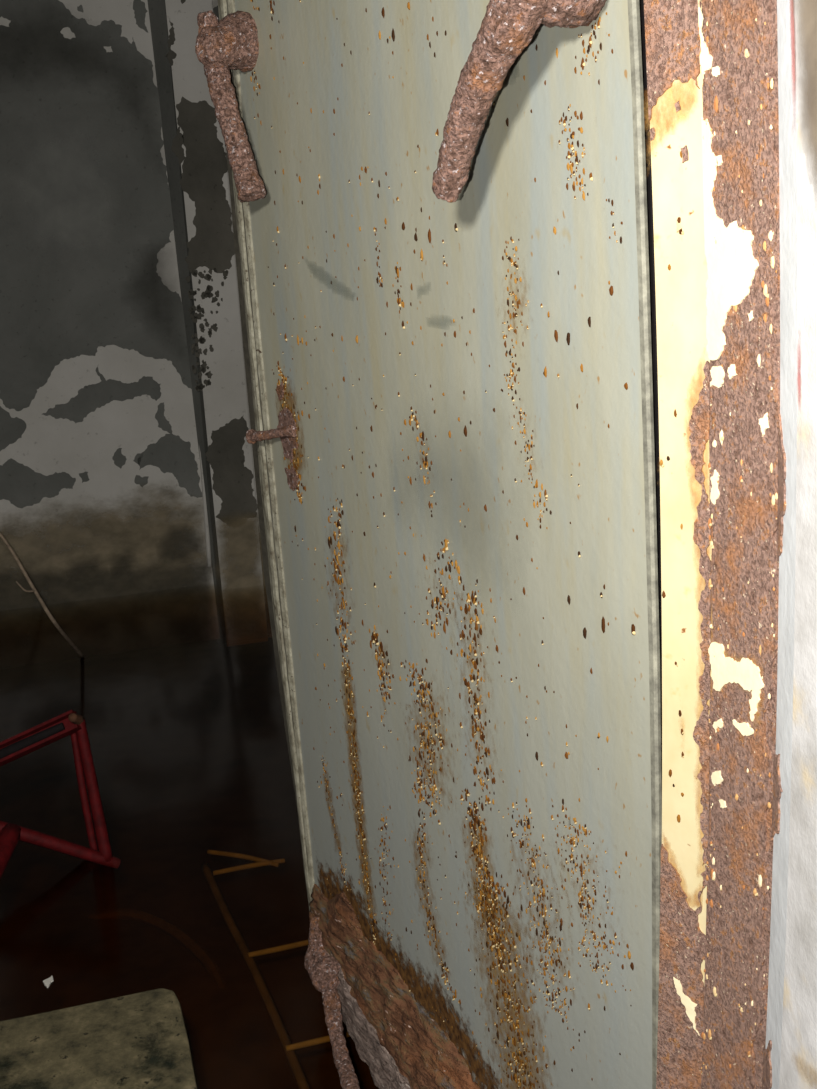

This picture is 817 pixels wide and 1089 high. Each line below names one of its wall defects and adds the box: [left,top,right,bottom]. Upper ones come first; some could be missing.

peeling [0,0,258,524]
corrosion [402,207,447,266]
peeling [701,117,759,388]
corrosion [272,316,358,505]
corrosion [501,237,552,540]
peeling [710,470,720,504]
corrosion [644,0,786,1089]
peeling [759,413,770,437]
corrosion [292,498,634,1089]
peeling [711,770,723,786]
peeling [708,642,764,736]